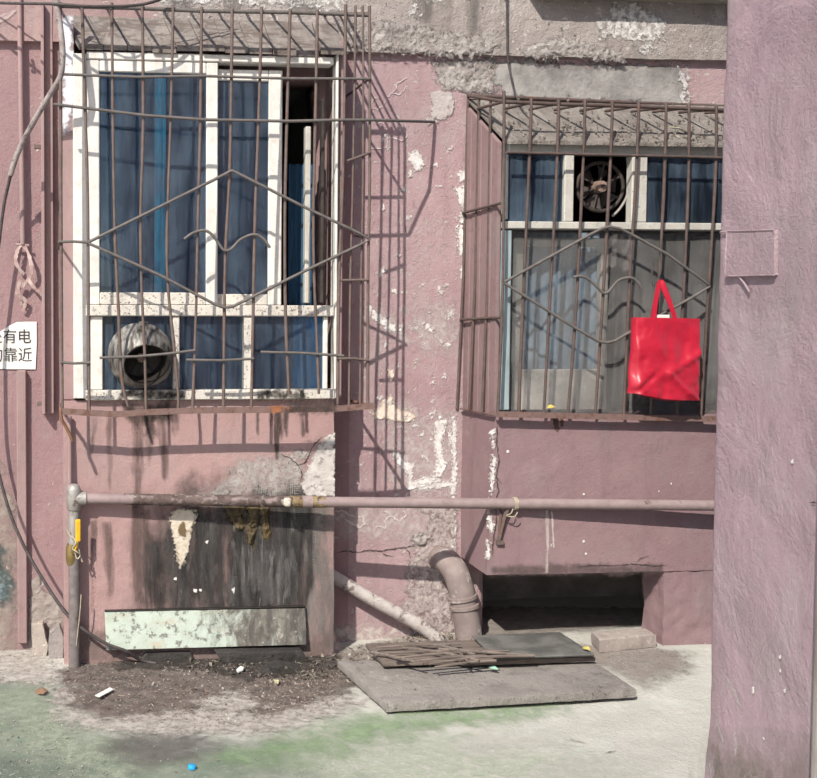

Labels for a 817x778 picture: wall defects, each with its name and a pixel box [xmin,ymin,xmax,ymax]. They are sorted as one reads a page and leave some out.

flaking render [347,0,692,126]
peeling [399,150,438,192]
peeling [454,170,465,279]
water stain [124,402,177,478]
water stain [212,413,311,496]
peeling [300,433,335,497]
peeling [488,428,497,498]
peeling [168,508,198,569]
water stain [132,505,404,656]
crack [336,545,414,559]
peeling [485,510,495,560]
water stain [80,634,219,662]